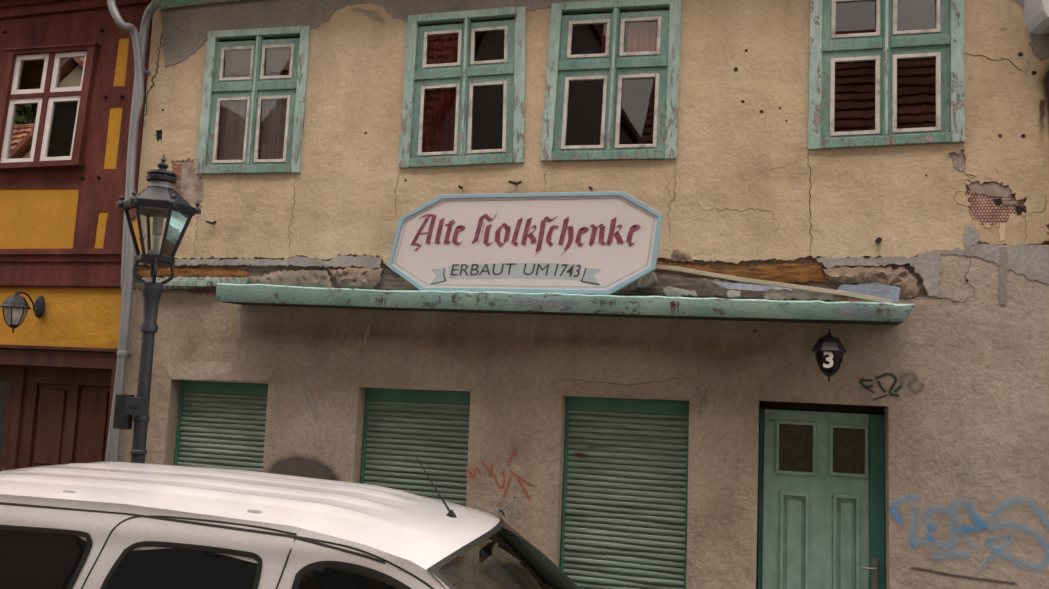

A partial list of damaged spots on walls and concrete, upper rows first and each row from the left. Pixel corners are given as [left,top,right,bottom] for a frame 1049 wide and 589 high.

spalling [171,158,203,207]
crack [666,165,779,232]
crack [758,152,813,262]
spalling [948,149,1027,228]
spalling [248,267,384,289]
spalling [823,265,919,300]